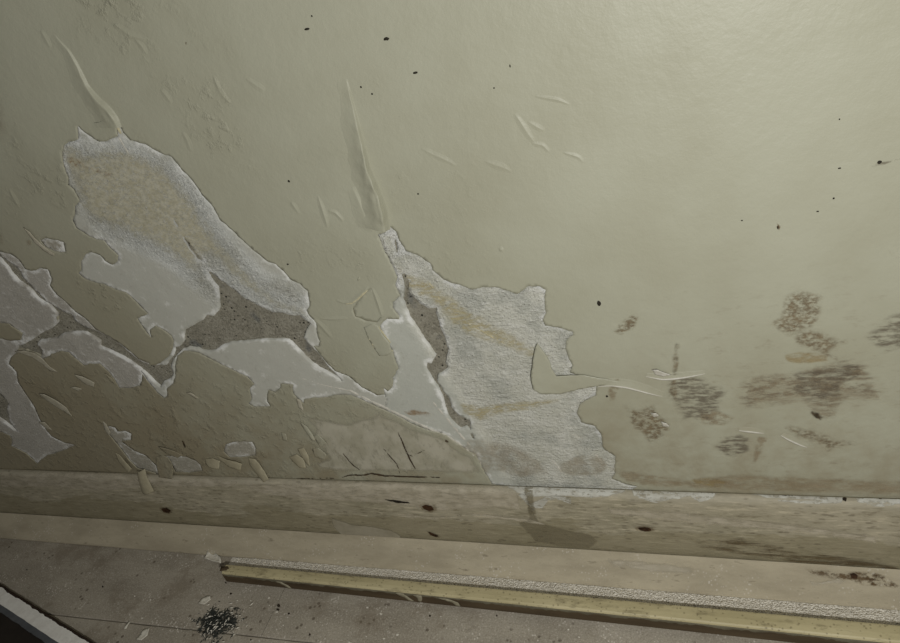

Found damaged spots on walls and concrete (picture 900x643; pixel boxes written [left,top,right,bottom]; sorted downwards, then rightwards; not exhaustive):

peeling [0,127,875,542]
leakage [749,296,874,406]